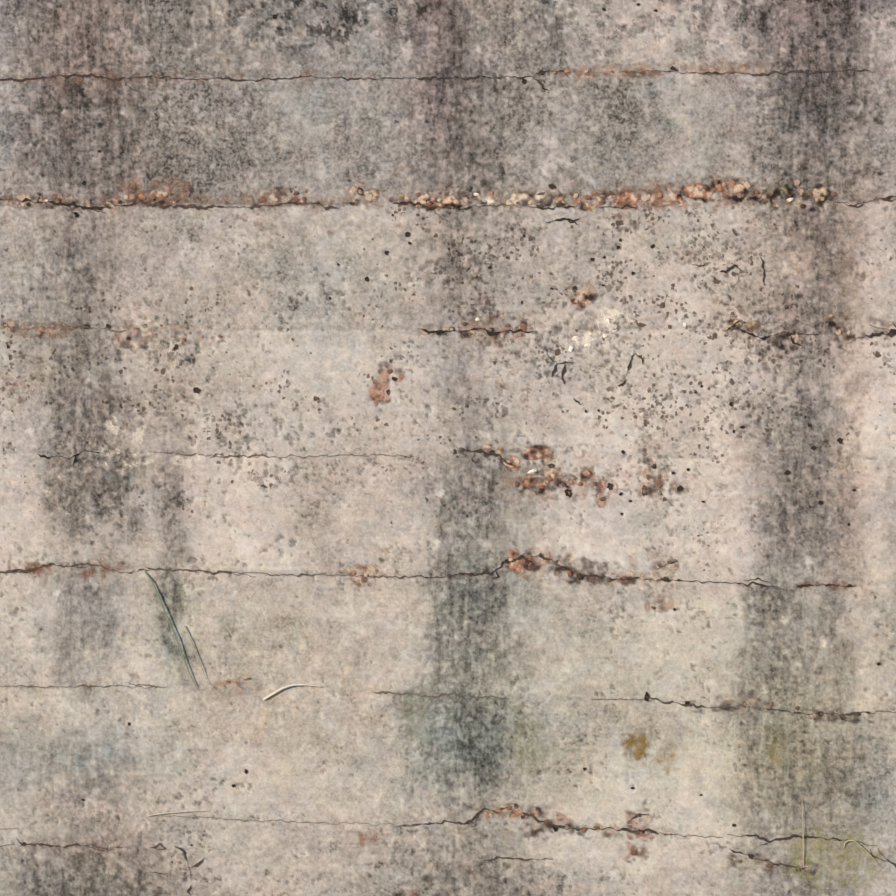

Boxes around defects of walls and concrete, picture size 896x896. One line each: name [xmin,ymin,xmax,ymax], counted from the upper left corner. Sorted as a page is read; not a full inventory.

crack [0,70,571,113]
water stain [174,0,505,320]
spalling [390,178,838,211]
water stain [8,0,163,537]
spalling [483,445,684,507]
crack [0,554,856,591]
spalling [505,550,678,585]
water stain [418,426,513,851]
crack [592,696,895,721]
water stain [745,713,867,820]
crack [162,806,896,870]
spalling [484,803,653,863]